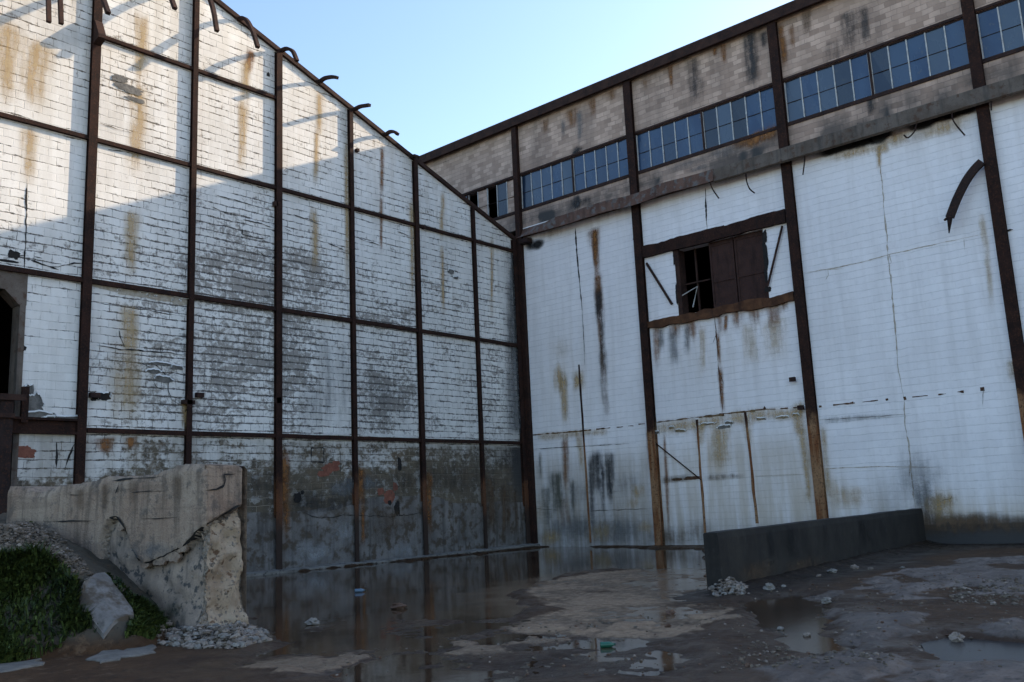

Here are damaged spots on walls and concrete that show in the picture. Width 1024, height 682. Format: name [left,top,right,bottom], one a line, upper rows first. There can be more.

corrosion [1,27,16,88]
corrosion [27,44,43,94]
corrosion [243,51,254,93]
leakage [744,32,766,81]
corrosion [25,131,34,170]
corrosion [132,95,144,158]
leakage [596,291,604,362]
crack [804,164,986,508]
peeling [20,383,88,420]
flaking render [18,445,36,458]
leakage [547,474,573,514]
leakage [589,453,613,510]